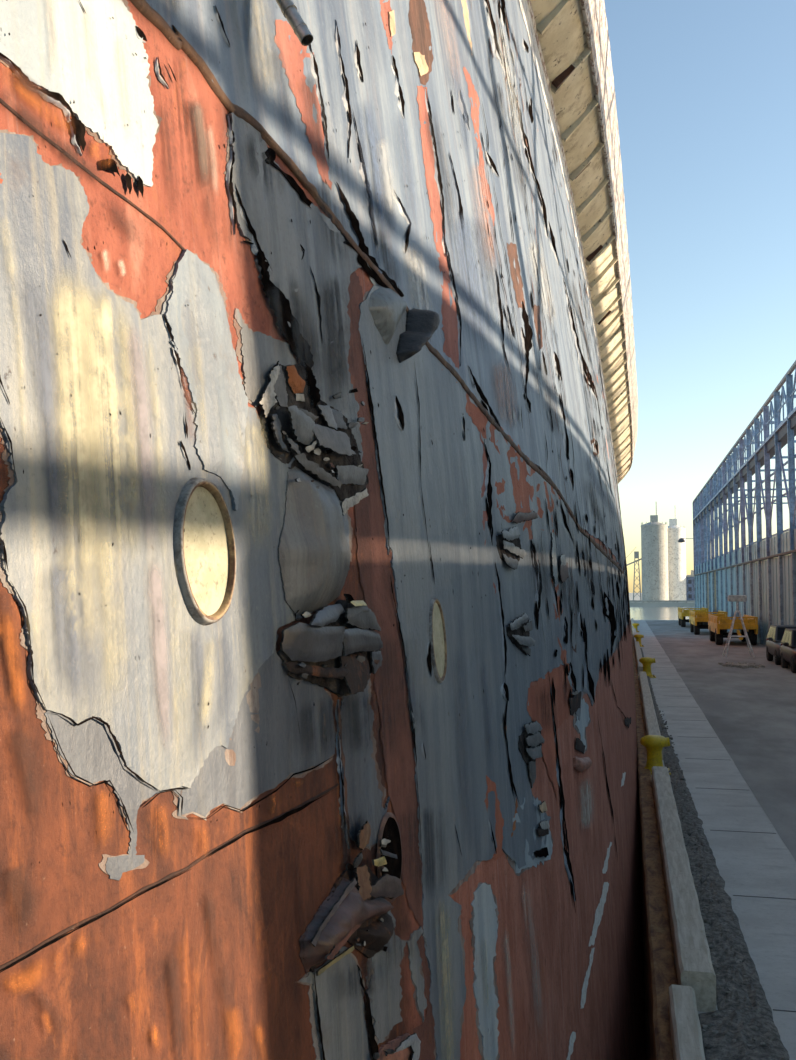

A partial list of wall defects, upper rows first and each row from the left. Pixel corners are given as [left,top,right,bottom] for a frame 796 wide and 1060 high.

peeling [0,0,162,187]
crack [309,20,412,297]
crack [0,377,18,482]
crack [0,540,350,973]
peeling [0,52,628,1060]
crack [390,0,631,912]